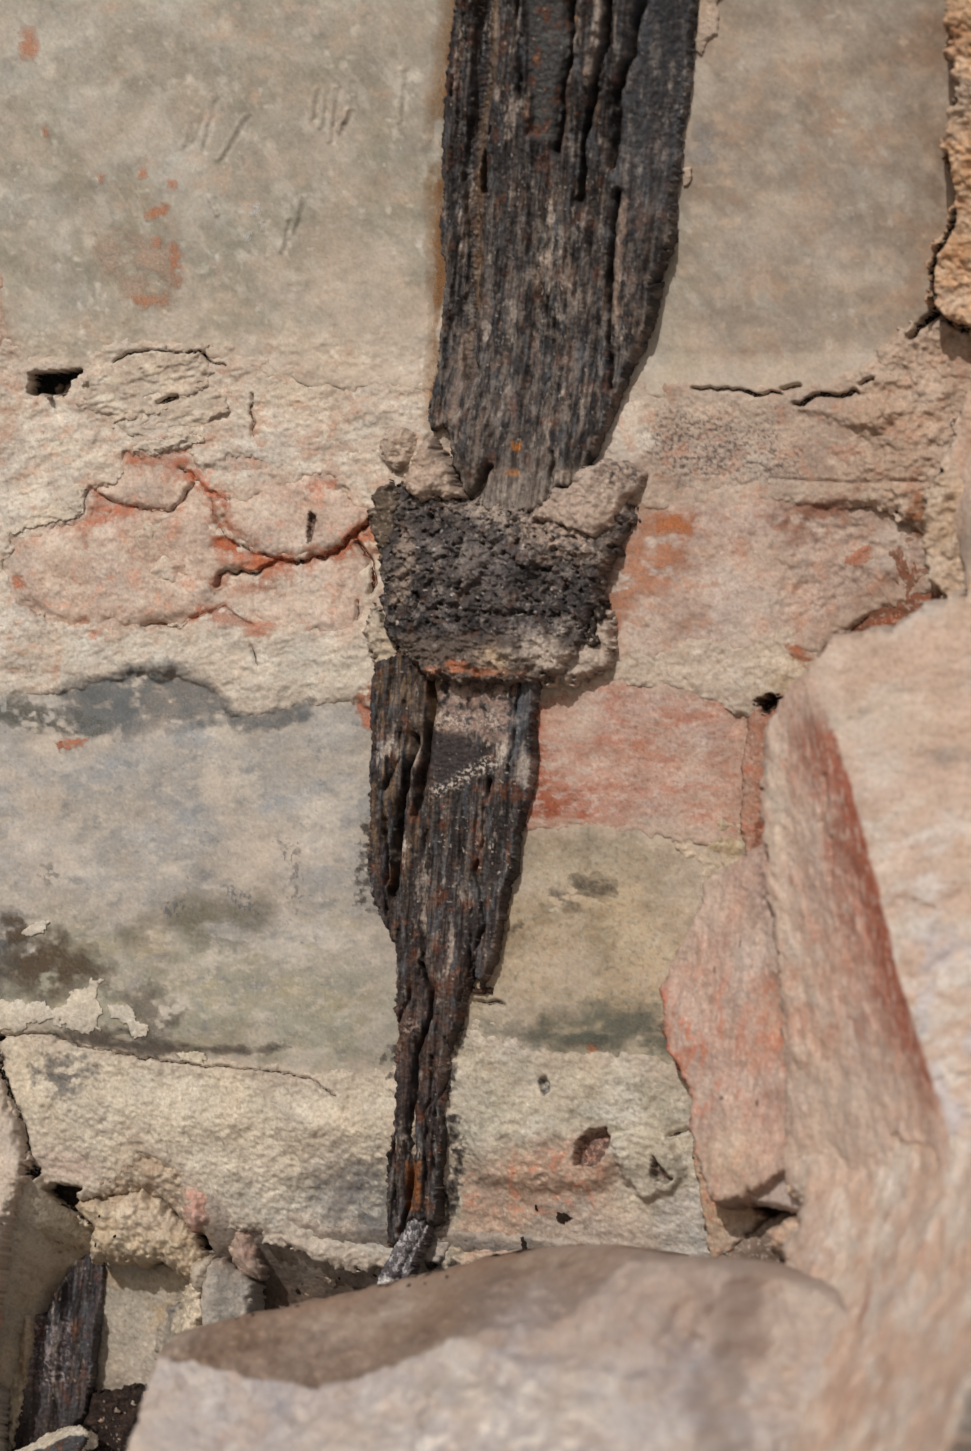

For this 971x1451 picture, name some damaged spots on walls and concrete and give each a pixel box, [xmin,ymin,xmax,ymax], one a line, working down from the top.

crack [913,174,971,338]
crack [115,349,226,366]
crack [694,379,870,407]
crack [774,468,943,483]
crack [92,469,377,666]
damp [0,664,308,734]